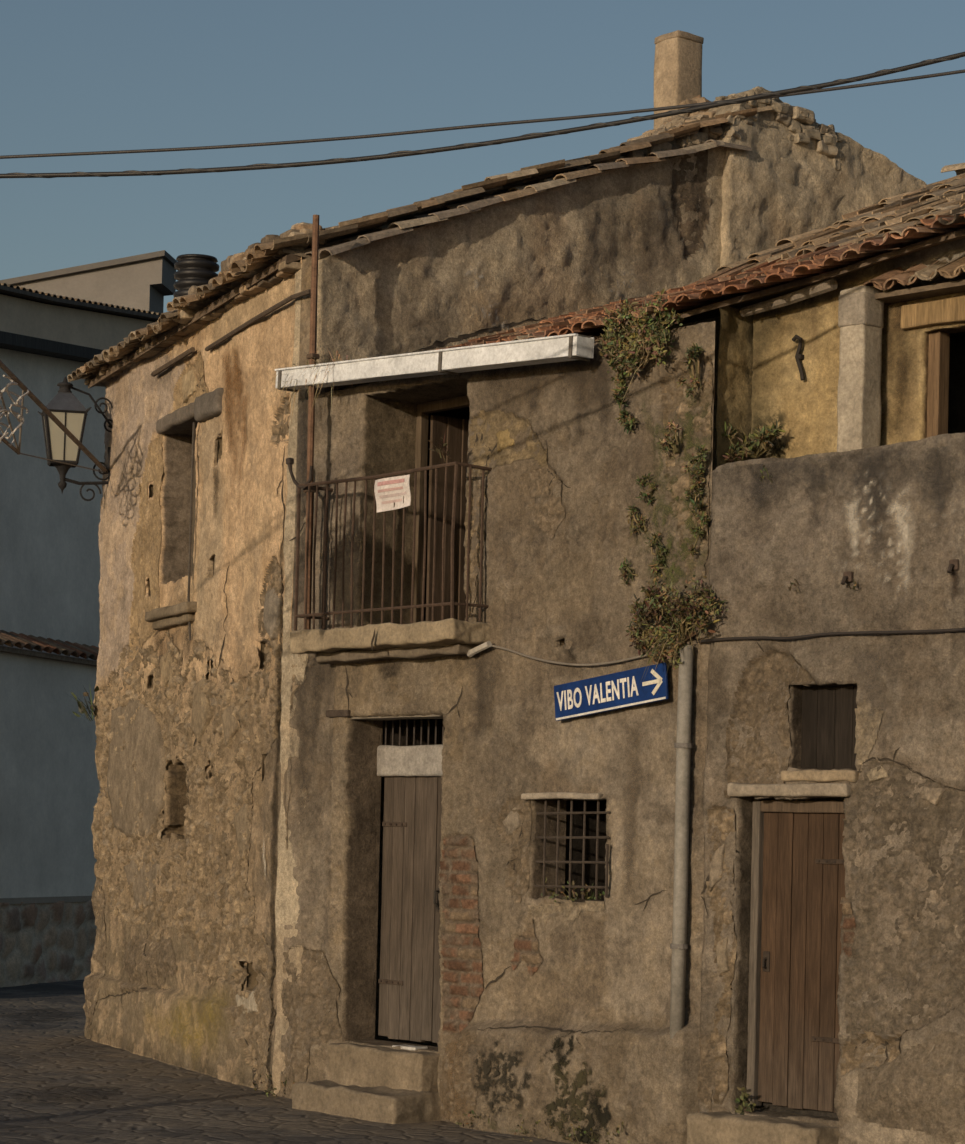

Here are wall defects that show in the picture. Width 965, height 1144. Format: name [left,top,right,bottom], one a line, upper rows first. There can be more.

spalling [270,393,290,446]
crack [546,442,571,516]
flaking render [83,434,342,1099]
crack [859,748,964,791]
flaking render [496,796,605,976]
flaking render [439,833,484,1034]
crack [470,1025,651,1046]
mould [474,1041,530,1116]
mould [540,1032,611,1144]